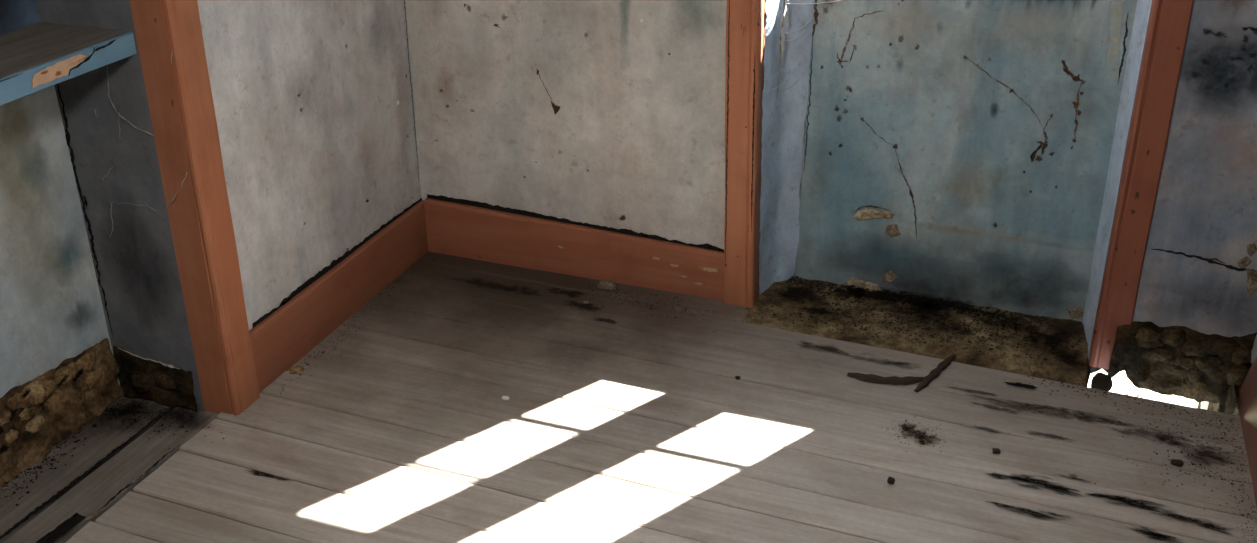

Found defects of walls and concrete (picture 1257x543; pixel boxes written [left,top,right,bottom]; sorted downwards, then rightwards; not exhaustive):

peeling [32,54,89,88]
crack [535,65,560,114]
crack [804,0,917,238]
crack [965,57,1085,162]
crack [1118,15,1128,82]
water stain [1187,31,1257,100]
spalling [842,270,897,291]
crack [1152,249,1257,271]
flaking render [1093,321,1256,416]
flaking render [0,338,197,487]